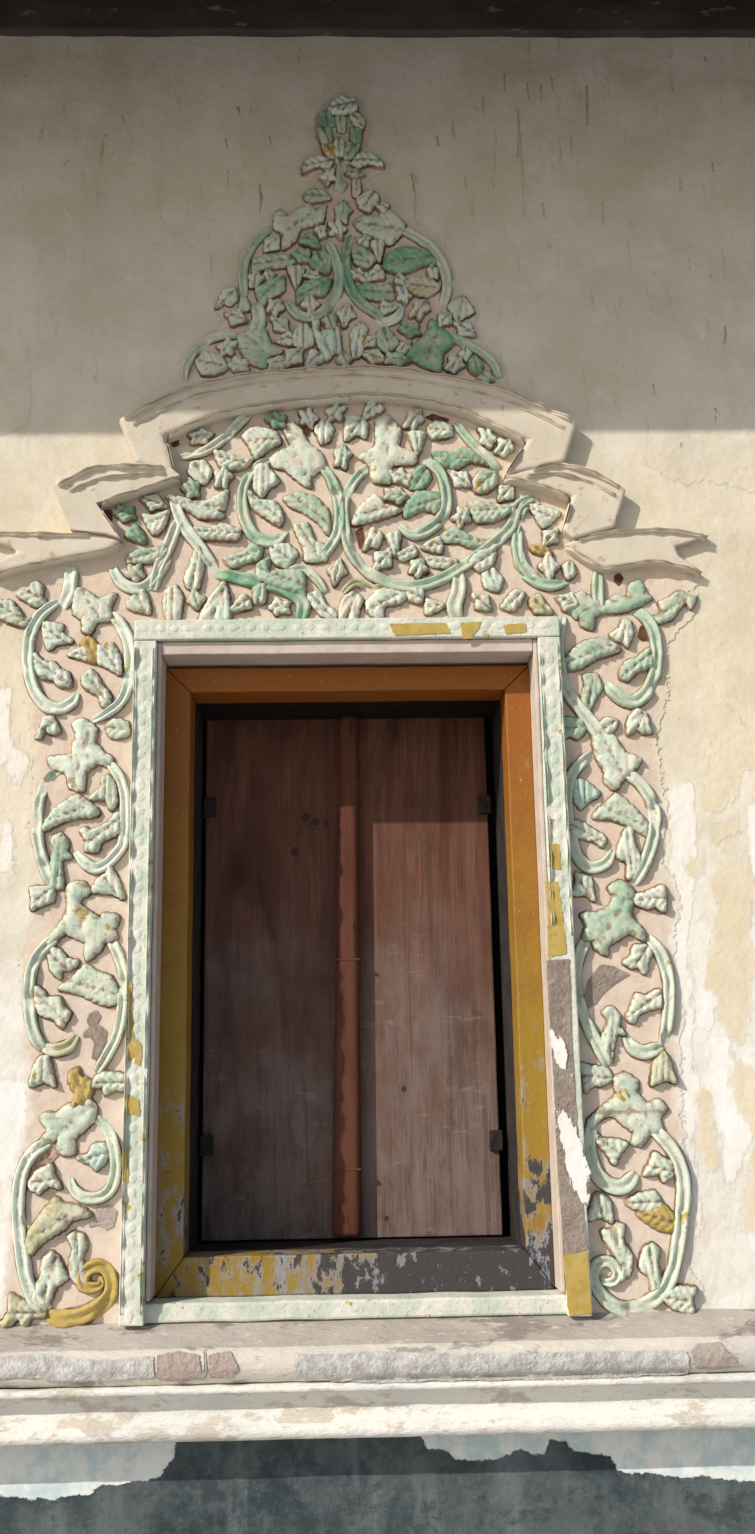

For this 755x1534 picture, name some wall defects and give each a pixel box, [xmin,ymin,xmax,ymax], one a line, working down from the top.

peeling [0,684,33,786]
peeling [0,818,16,878]
peeling [667,779,755,1254]
peeling [0,1077,59,1314]
peeling [0,1442,177,1501]
peeling [421,1428,755,1483]